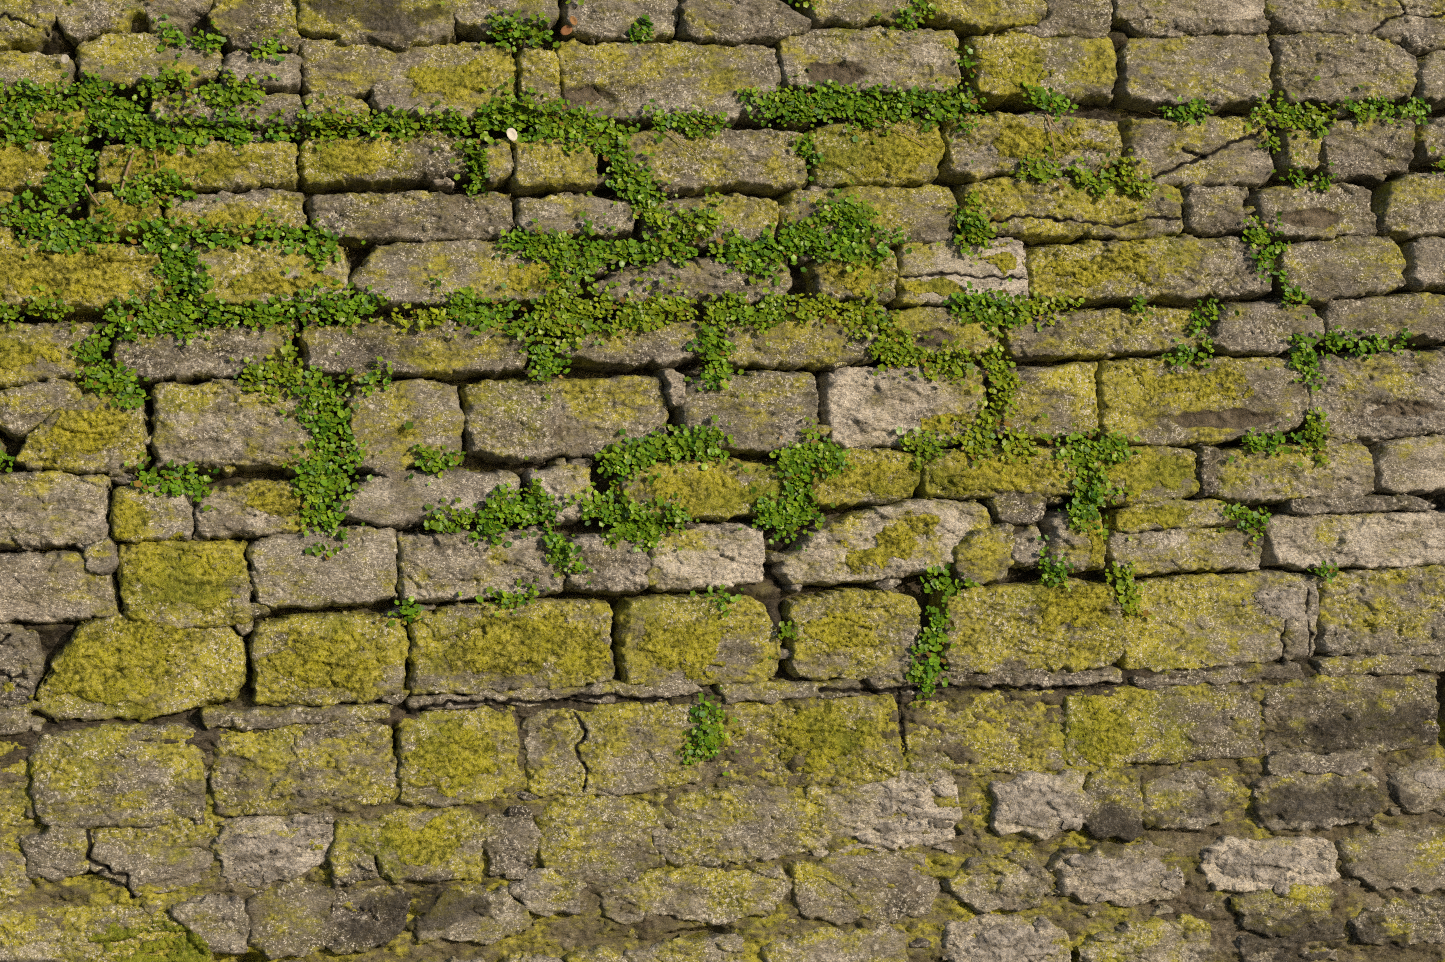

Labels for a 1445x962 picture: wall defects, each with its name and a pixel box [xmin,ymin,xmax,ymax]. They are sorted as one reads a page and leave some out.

crack [405,693,699,793]
crack [80,829,135,899]